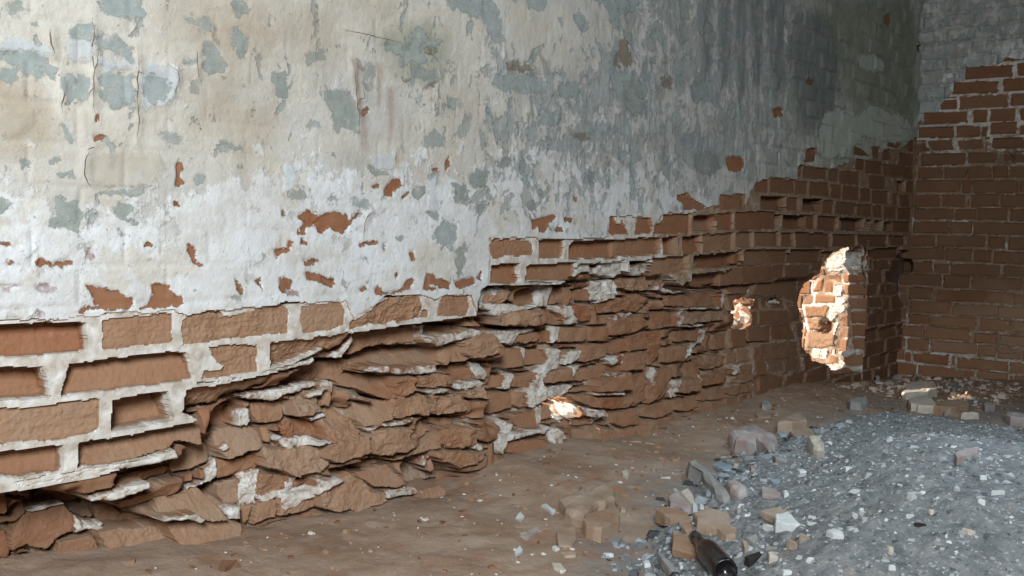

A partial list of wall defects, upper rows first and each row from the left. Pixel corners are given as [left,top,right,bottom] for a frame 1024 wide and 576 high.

peeling [97,0,146,21]
peeling [0,22,227,142]
peeling [324,89,369,134]
peeling [0,197,12,214]
peeling [49,195,83,232]
peeling [99,184,144,225]
flaking render [174,162,205,187]
flaking render [275,163,369,259]
peeling [368,152,426,200]
peeling [451,156,536,217]
spalling [468,57,1024,462]
spalling [0,277,505,558]